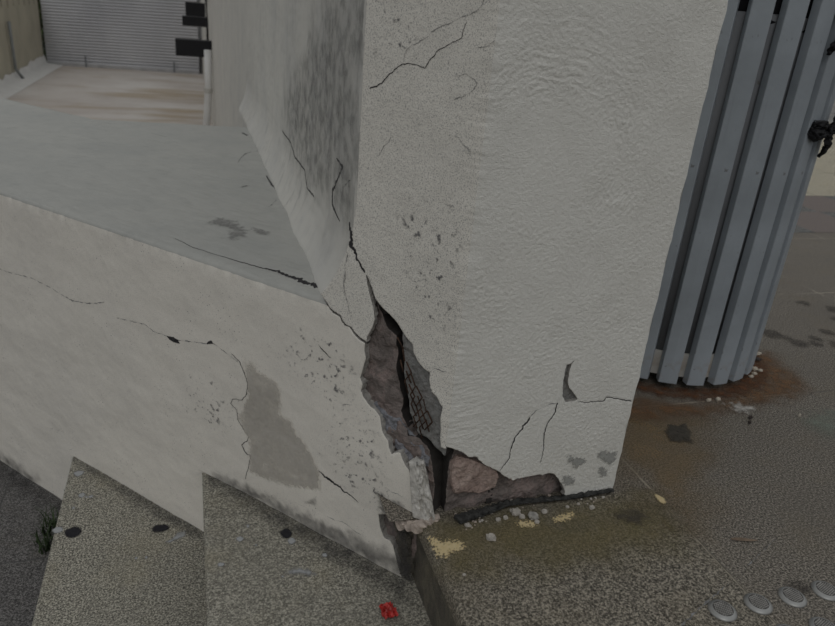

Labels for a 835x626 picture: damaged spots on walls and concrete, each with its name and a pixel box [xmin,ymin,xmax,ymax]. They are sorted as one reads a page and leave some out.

crack [369,0,491,89]
crack [177,239,318,288]
crack [282,130,365,313]
crack [119,318,250,479]
spalling [363,293,575,516]
crack [501,403,558,469]
rust [631,355,800,418]